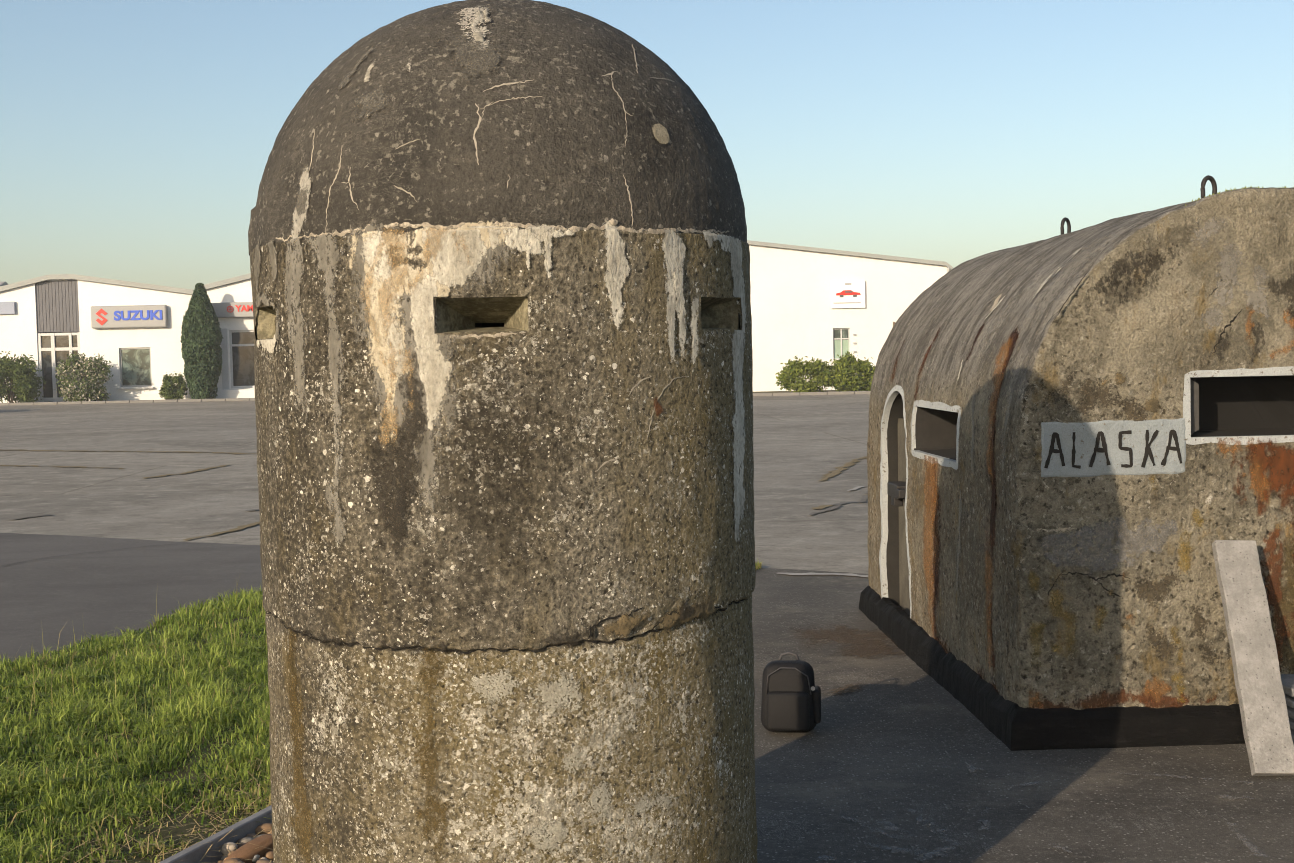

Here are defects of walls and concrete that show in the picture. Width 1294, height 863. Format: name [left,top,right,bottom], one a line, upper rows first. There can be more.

peeling [437,6,499,81]
damp [254,167,575,554]
damp [604,220,630,329]
damp [662,230,699,364]
damp [703,230,746,542]
crack [265,599,748,654]
spalling [546,595,715,648]
crack [776,570,868,578]
corrosion [923,455,941,638]
corrosion [984,327,1019,673]
crack [1048,572,1130,608]
corrosion [1218,438,1294,672]